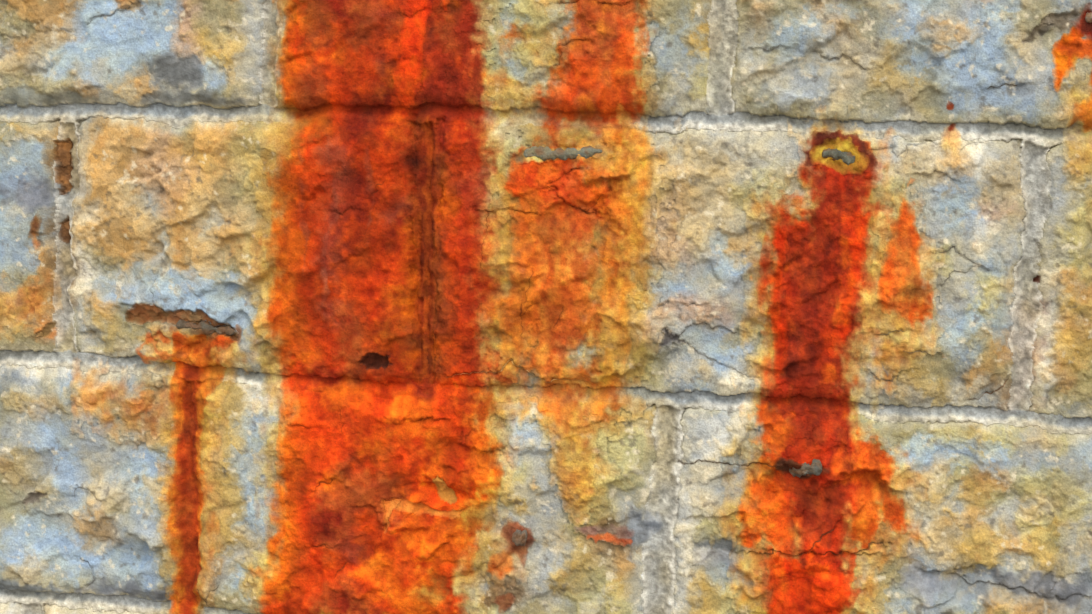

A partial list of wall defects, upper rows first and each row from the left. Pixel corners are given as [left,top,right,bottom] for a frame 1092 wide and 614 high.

rust [69,0,685,614]
rust [709,104,947,614]
rust [1051,1,1092,177]